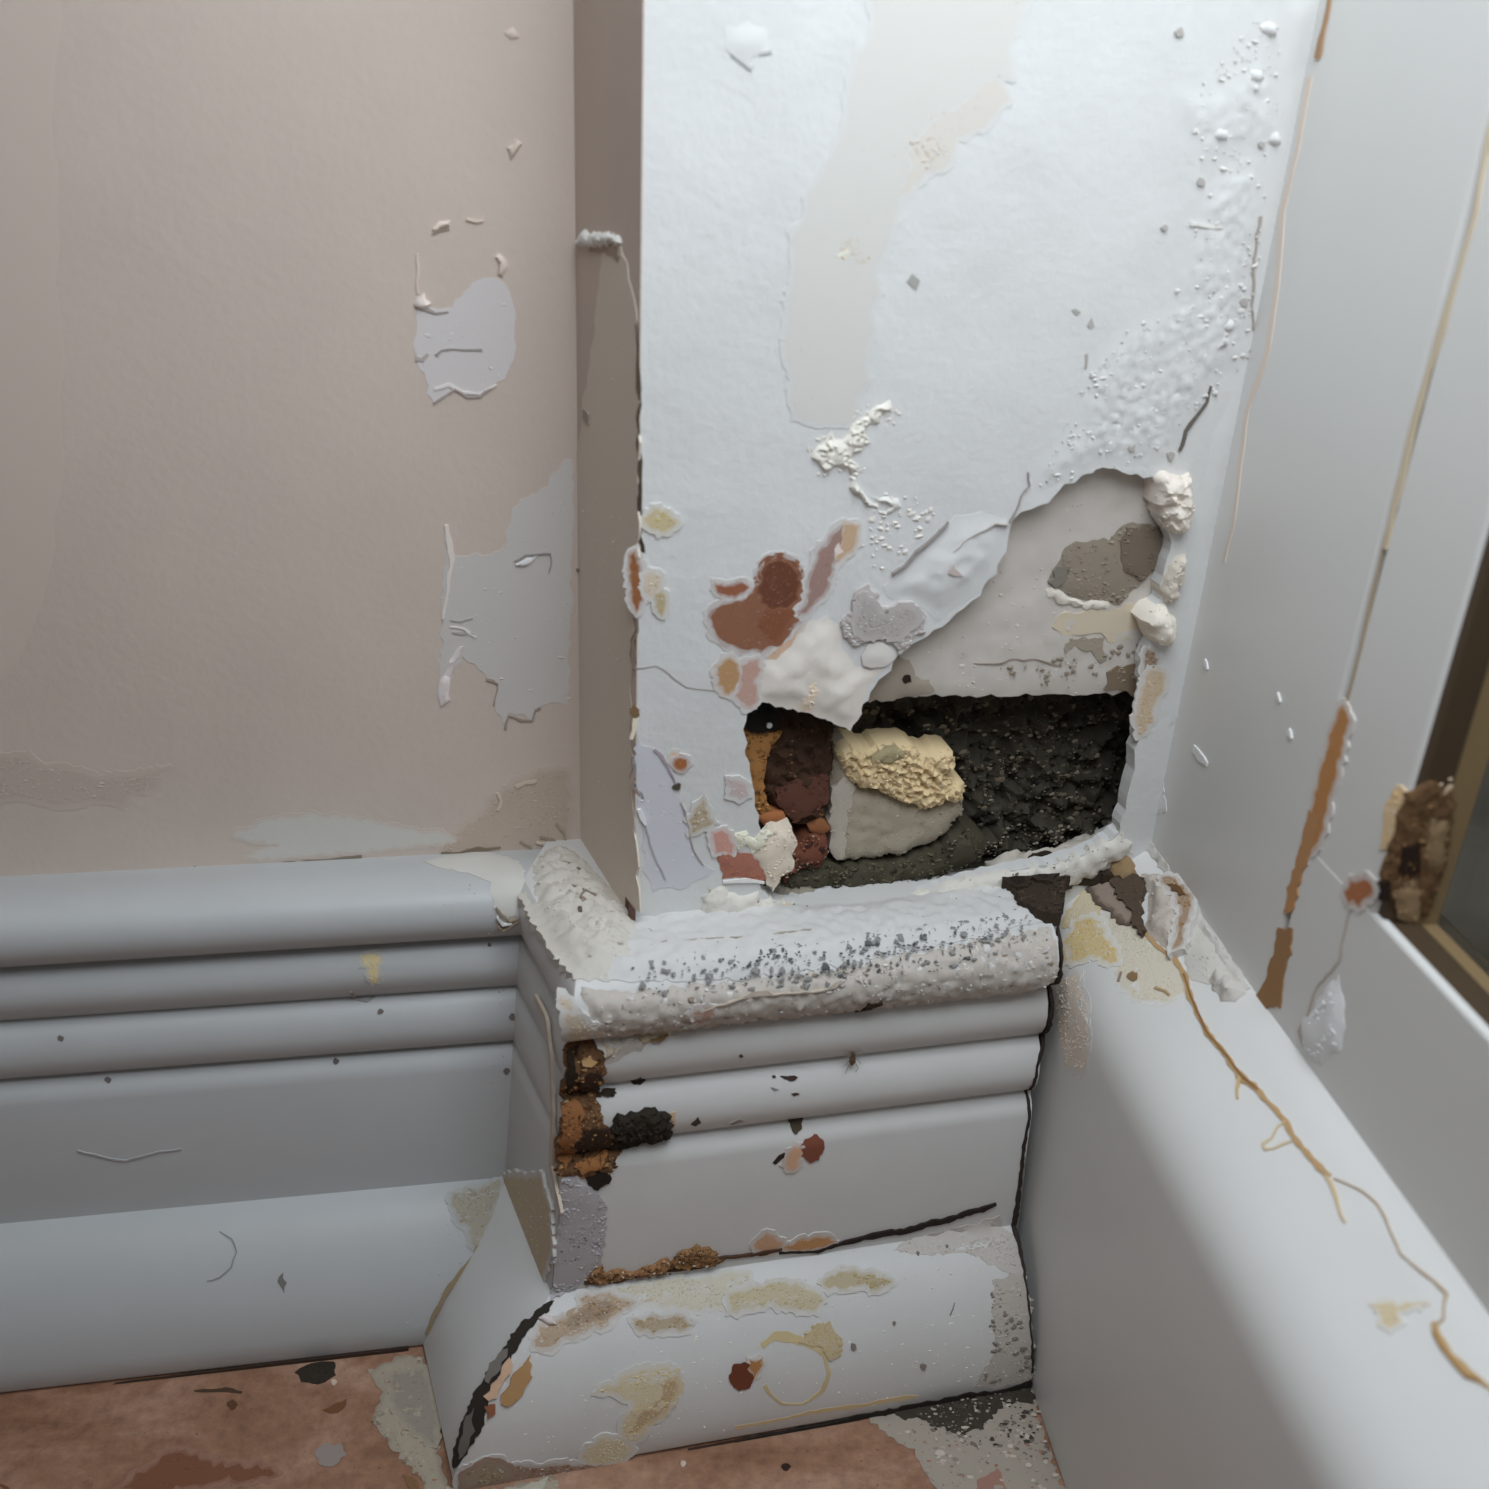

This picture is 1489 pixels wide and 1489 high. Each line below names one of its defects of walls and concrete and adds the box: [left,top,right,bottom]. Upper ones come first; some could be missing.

peeling [412,254,516,404]
crack [635,324,645,553]
spalling [1047,522,1163,606]
flaking render [758,615,1134,869]
corrosion [1256,697,1356,1009]
corrosion [1340,871,1380,915]
crack [1297,909,1352,1049]
peeling [773,1118,825,1174]
crack [584,925,1064,1373]
crack [1145,932,1489,1389]
peeling [538,1176,609,1325]
peeling [729,1354,767,1391]